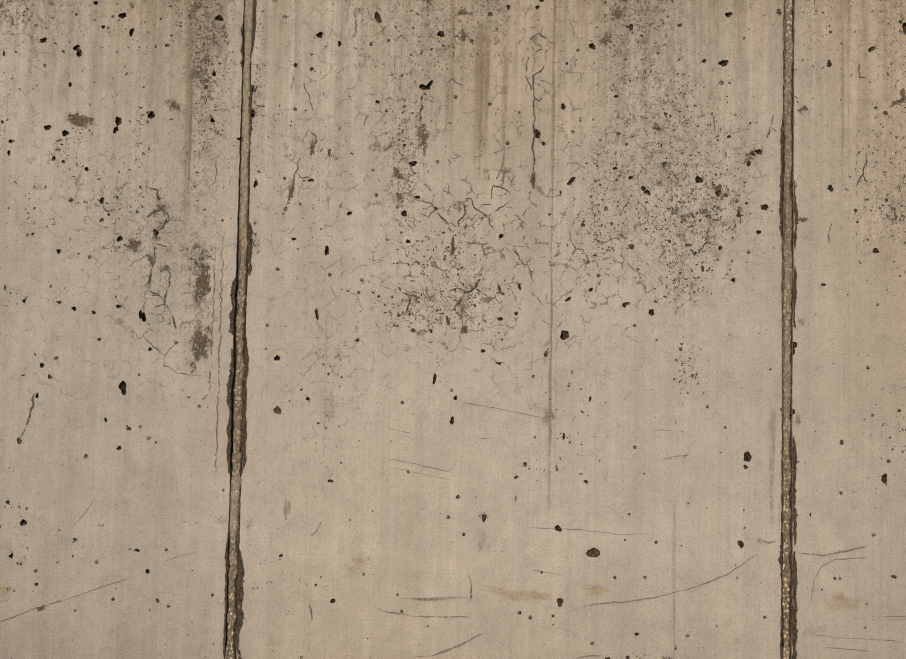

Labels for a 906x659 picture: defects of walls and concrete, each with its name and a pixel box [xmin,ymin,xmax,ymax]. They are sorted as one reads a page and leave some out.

crack [524,29,546,188]
crack [143,187,225,468]
crack [401,158,511,255]
crack [439,246,529,325]